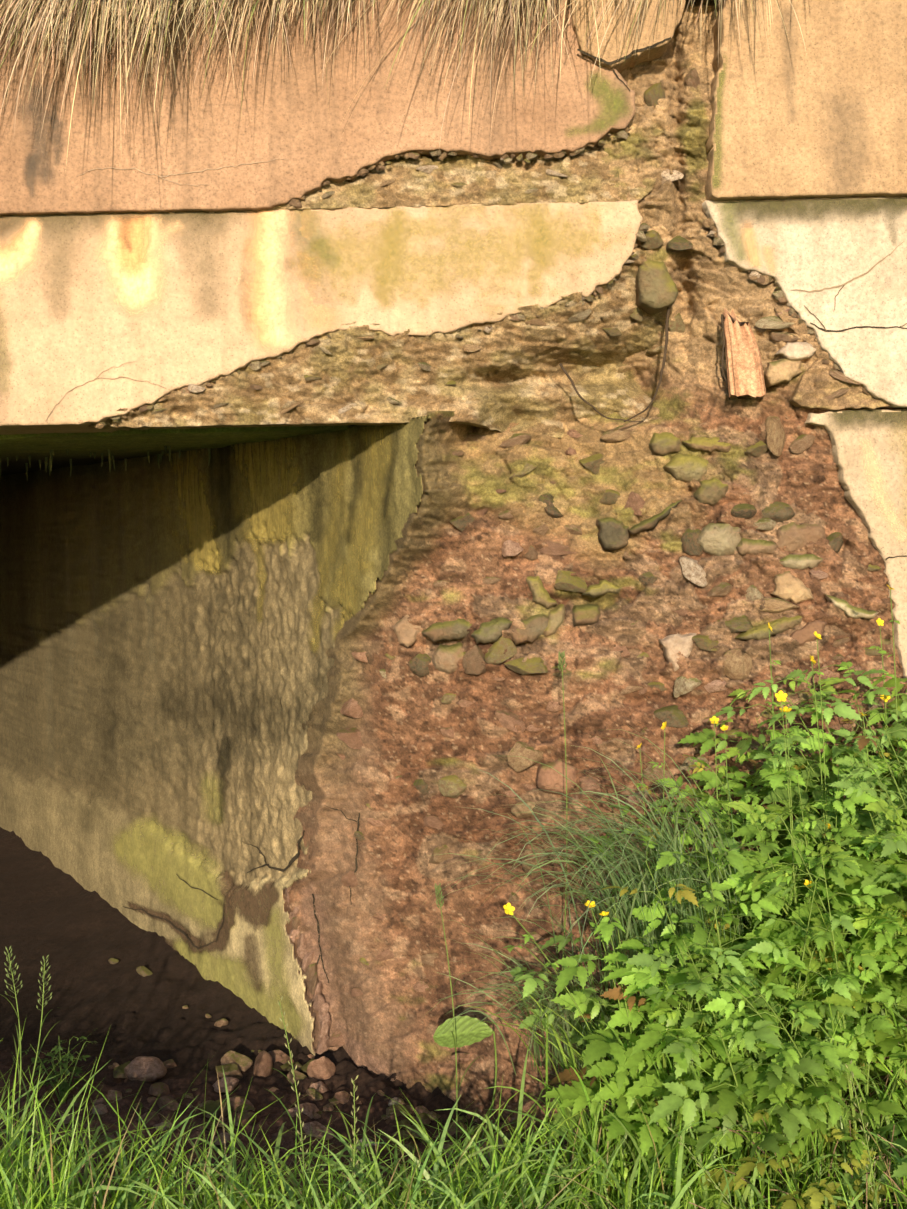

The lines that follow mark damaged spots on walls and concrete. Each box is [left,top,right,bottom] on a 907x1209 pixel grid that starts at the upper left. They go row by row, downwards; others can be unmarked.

spalling [268,128,657,210]
rust [103,217,160,309]
rust [252,209,293,347]
spalling [88,223,669,438]
spalling [702,218,725,252]
spalling [747,270,893,411]
crack [795,241,907,332]
damp [115,820,224,928]
crack [123,874,225,949]
crack [242,830,305,873]
crack [326,806,360,901]
peeling [128,870,331,1055]